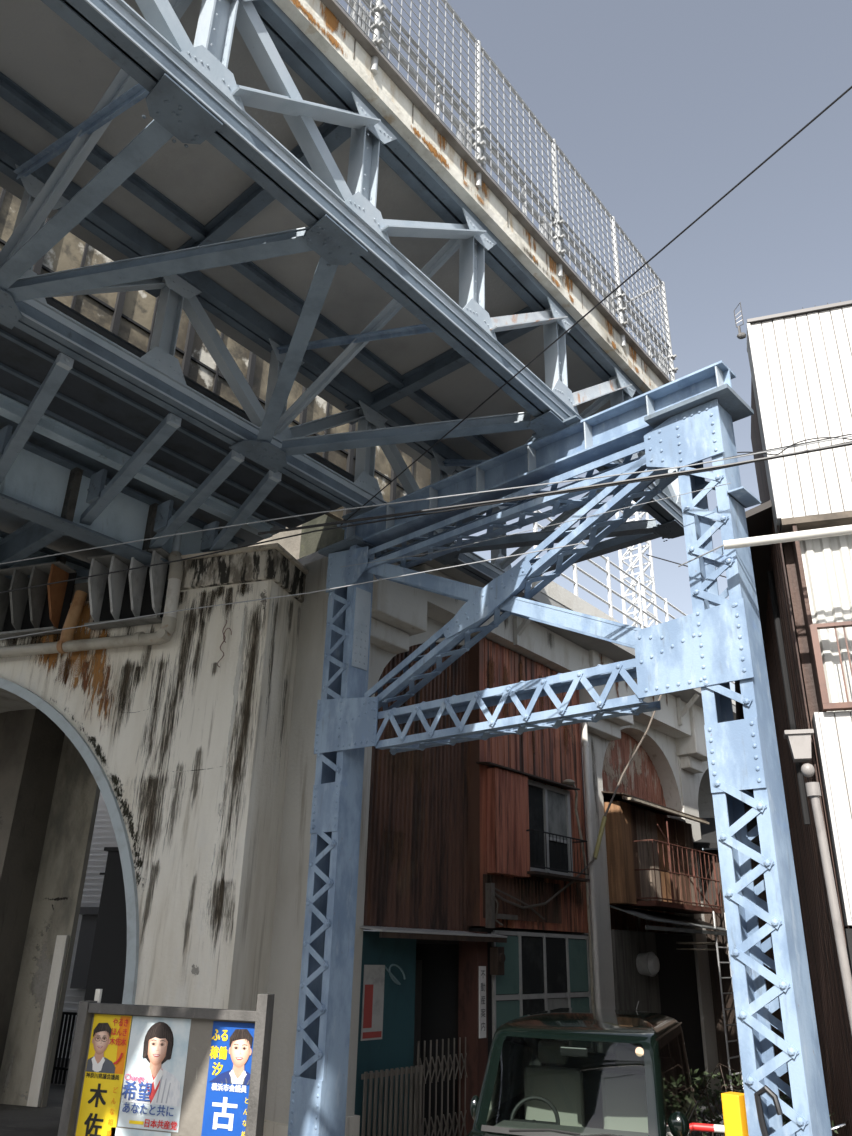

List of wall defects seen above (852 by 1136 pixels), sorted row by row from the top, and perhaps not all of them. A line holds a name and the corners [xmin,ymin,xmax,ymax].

corrosion [320,5,346,48]
corrosion [460,161,488,209]
corrosion [526,233,574,303]
corrosion [35,601,114,729]
water stain [112,584,301,952]